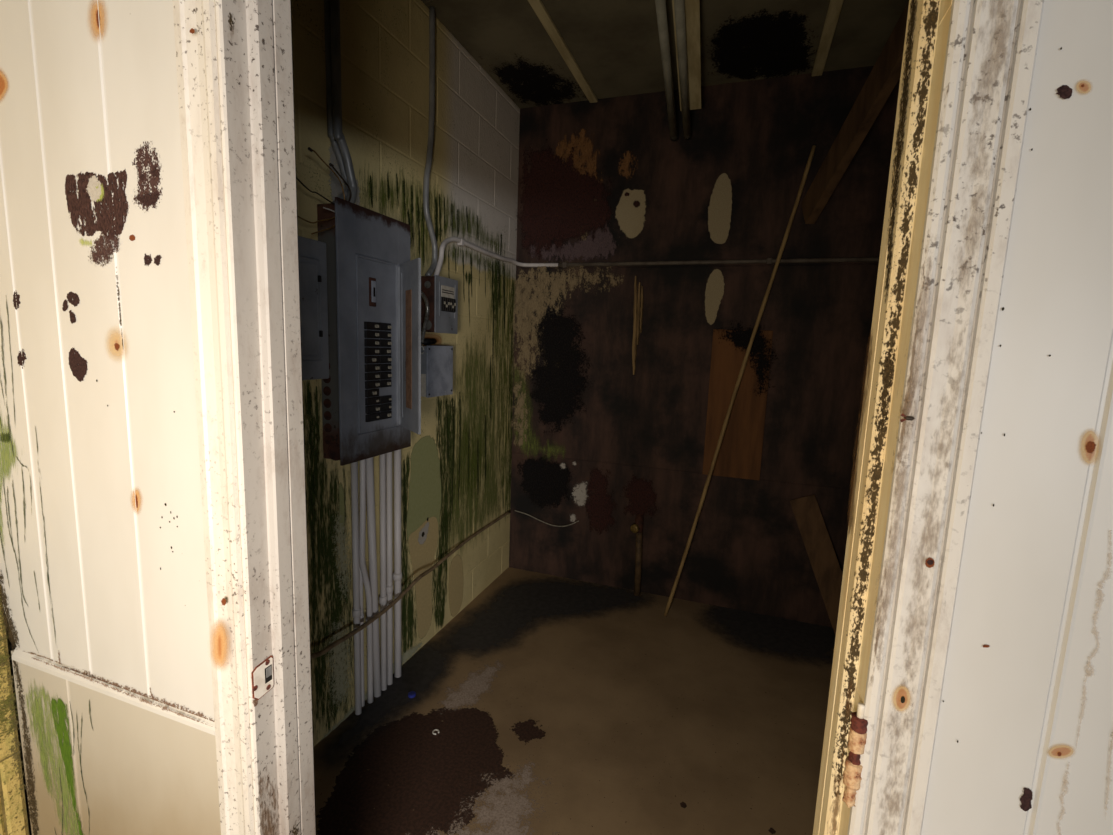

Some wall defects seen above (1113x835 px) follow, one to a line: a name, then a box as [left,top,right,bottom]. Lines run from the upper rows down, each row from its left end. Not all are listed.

corrosion [0,71,8,100]
peeling [65,141,163,267]
peeling [513,150,646,386]
peeling [708,173,732,244]
damp [387,172,506,586]
damp [706,0,939,835]
corrosion [1081,431,1098,463]
damp [0,300,51,835]
corrosion [212,624,227,667]
damp [316,579,647,835]
corrosion [894,687,910,711]
corrosion [1049,745,1073,758]